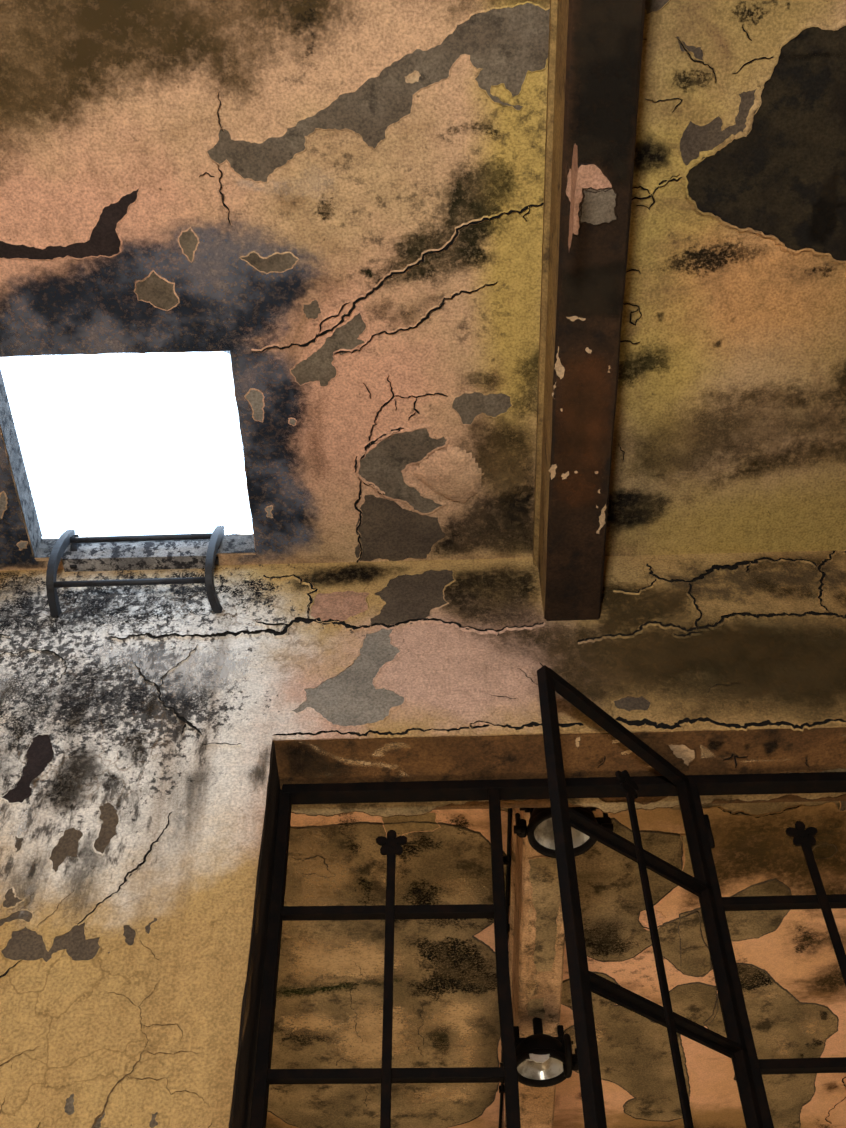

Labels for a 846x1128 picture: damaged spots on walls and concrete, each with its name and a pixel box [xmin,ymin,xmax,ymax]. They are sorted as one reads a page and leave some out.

flaking render [0,185,141,261]
flaking render [205,1,550,183]
crack [251,200,544,354]
flaking render [674,18,846,280]
mould [618,350,667,383]
flaking render [0,734,56,805]
leakage [0,567,278,809]
crack [89,574,584,747]
flaking render [290,423,456,728]
leakage [607,490,669,530]
crack [577,550,846,644]
crack [615,683,846,768]